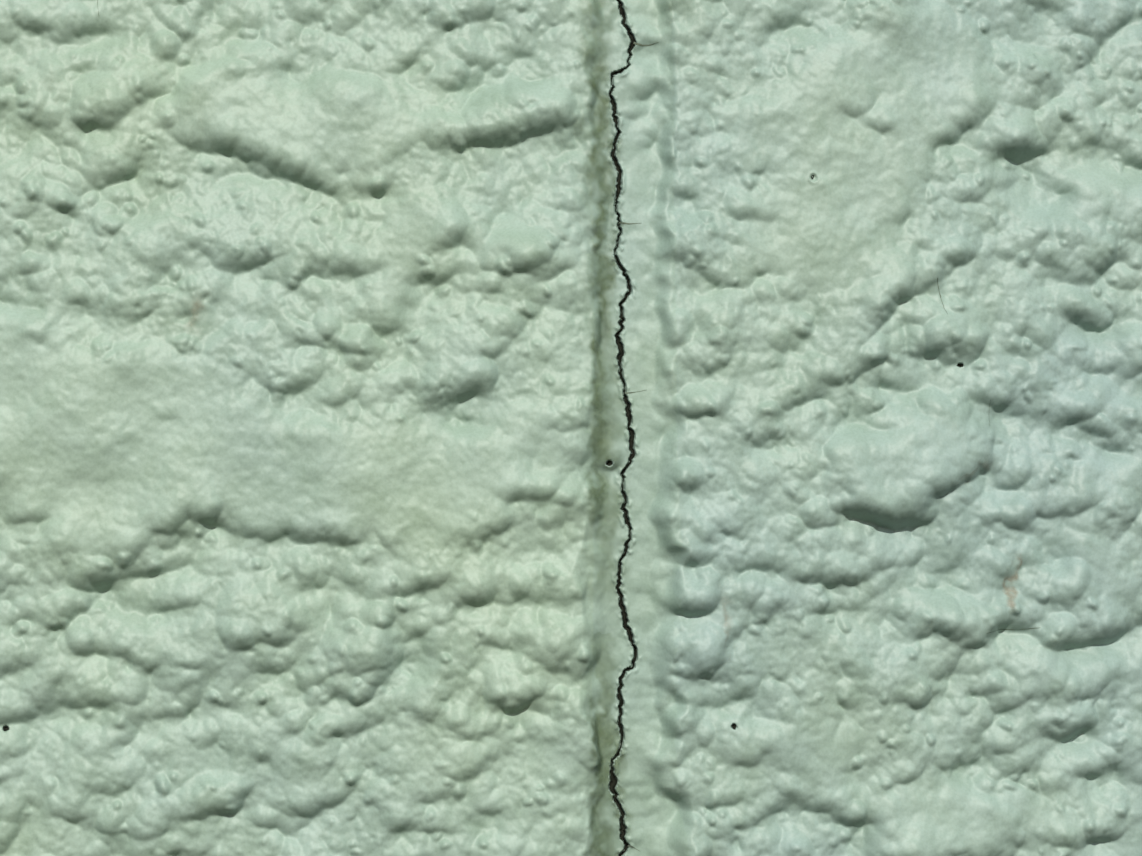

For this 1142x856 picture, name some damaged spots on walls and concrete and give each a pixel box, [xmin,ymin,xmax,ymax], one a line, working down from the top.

crack [609,0,659,856]